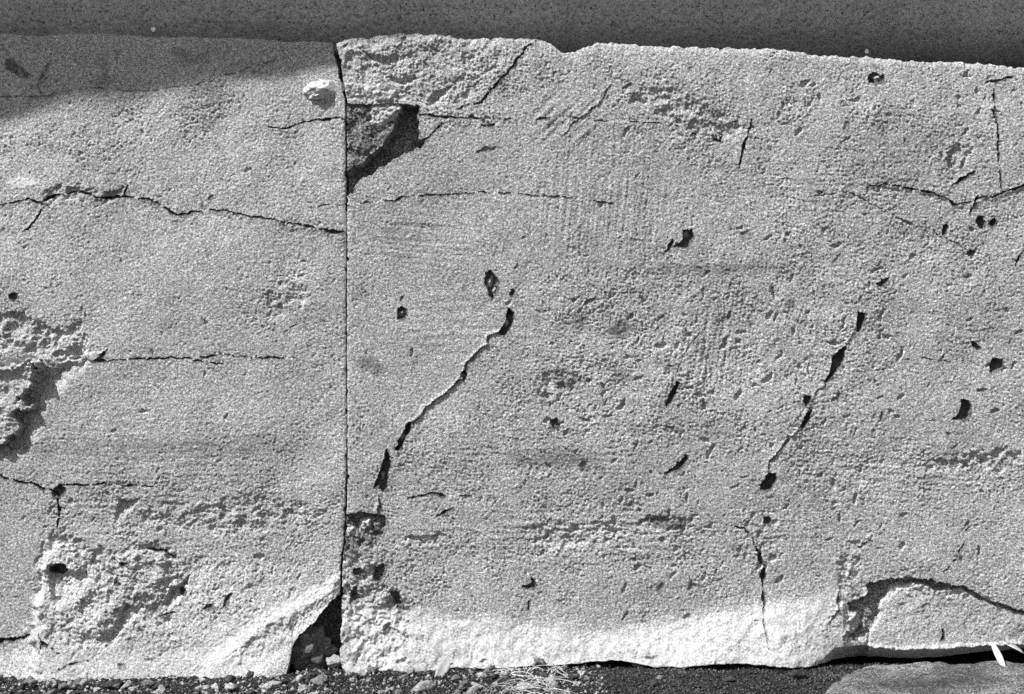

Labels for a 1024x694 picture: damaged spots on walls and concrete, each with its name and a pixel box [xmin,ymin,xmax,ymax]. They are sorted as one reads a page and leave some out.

crack [0,184,614,234]
flaking render [338,33,507,197]
crack [418,40,753,168]
crack [808,75,1024,250]
flaking render [0,292,107,462]
crack [92,324,298,365]
crack [373,308,515,517]
crack [759,311,866,491]
flaking render [32,489,331,657]
spalling [197,511,447,679]
crack [734,525,770,650]
flaking render [826,529,1024,658]